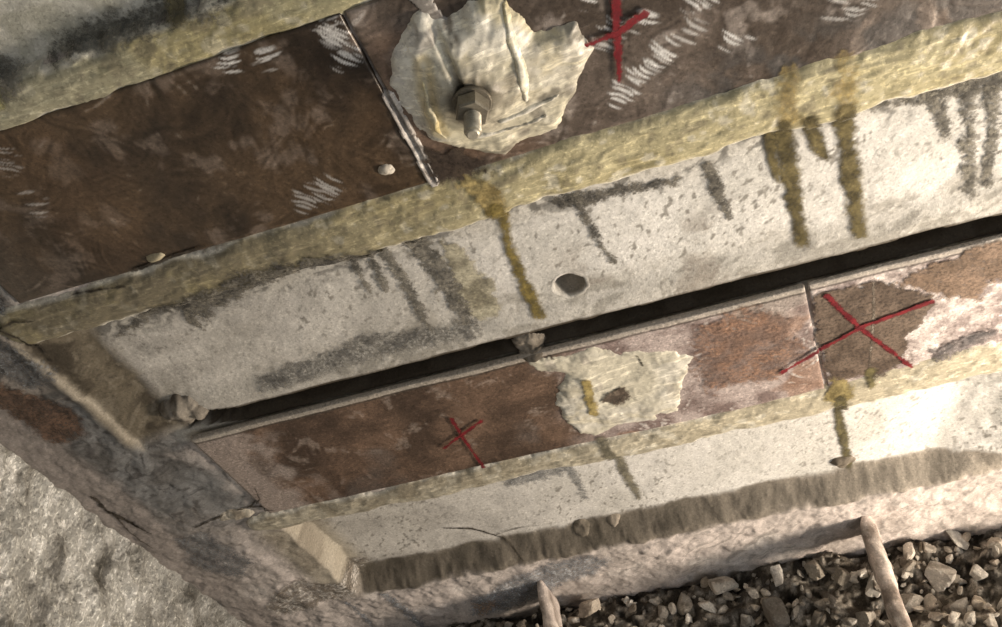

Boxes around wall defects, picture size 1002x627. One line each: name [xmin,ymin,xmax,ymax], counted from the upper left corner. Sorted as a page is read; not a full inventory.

damp [764,57,1002,247]
damp [456,174,547,319]
damp [865,368,876,389]
corrosion [0,382,84,444]
damp [825,377,854,469]
crack [90,496,151,547]
crack [446,527,523,561]